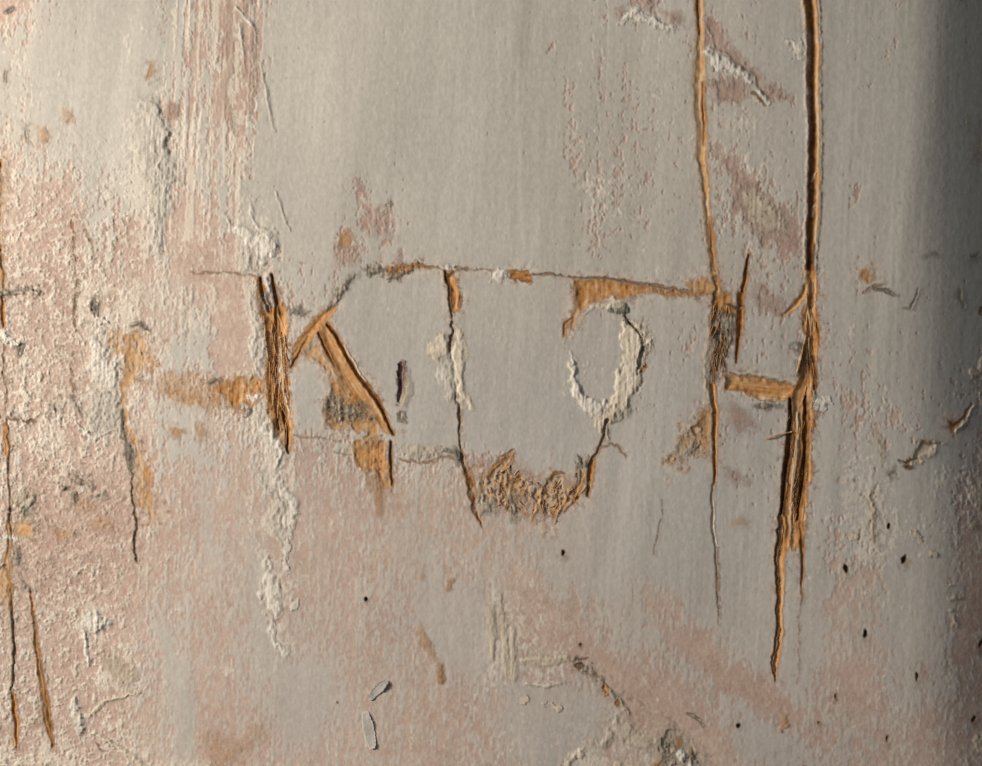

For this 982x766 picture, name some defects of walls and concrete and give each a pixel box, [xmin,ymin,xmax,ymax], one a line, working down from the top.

crack [191,270,255,278]
crack [364,259,722,296]
crack [0,159,54,749]
crack [131,478,139,562]
peeling [212,191,412,659]
spalling [464,449,595,524]